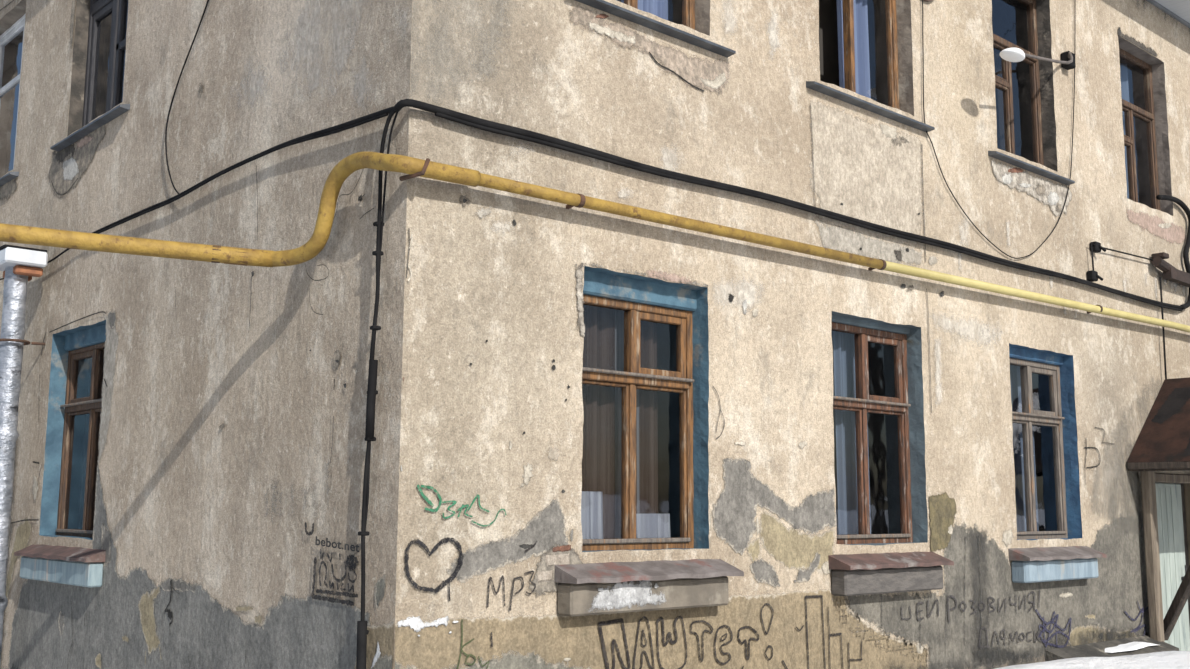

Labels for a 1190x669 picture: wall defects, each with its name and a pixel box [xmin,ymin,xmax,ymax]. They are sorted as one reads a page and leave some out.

spalling [570,4,730,94]
spalling [49,124,105,197]
spalling [991,160,1072,217]
peeling [8,311,459,669]
peeling [447,489,583,597]
peeling [712,442,837,587]
peeling [845,492,1150,669]
peeling [442,651,591,669]